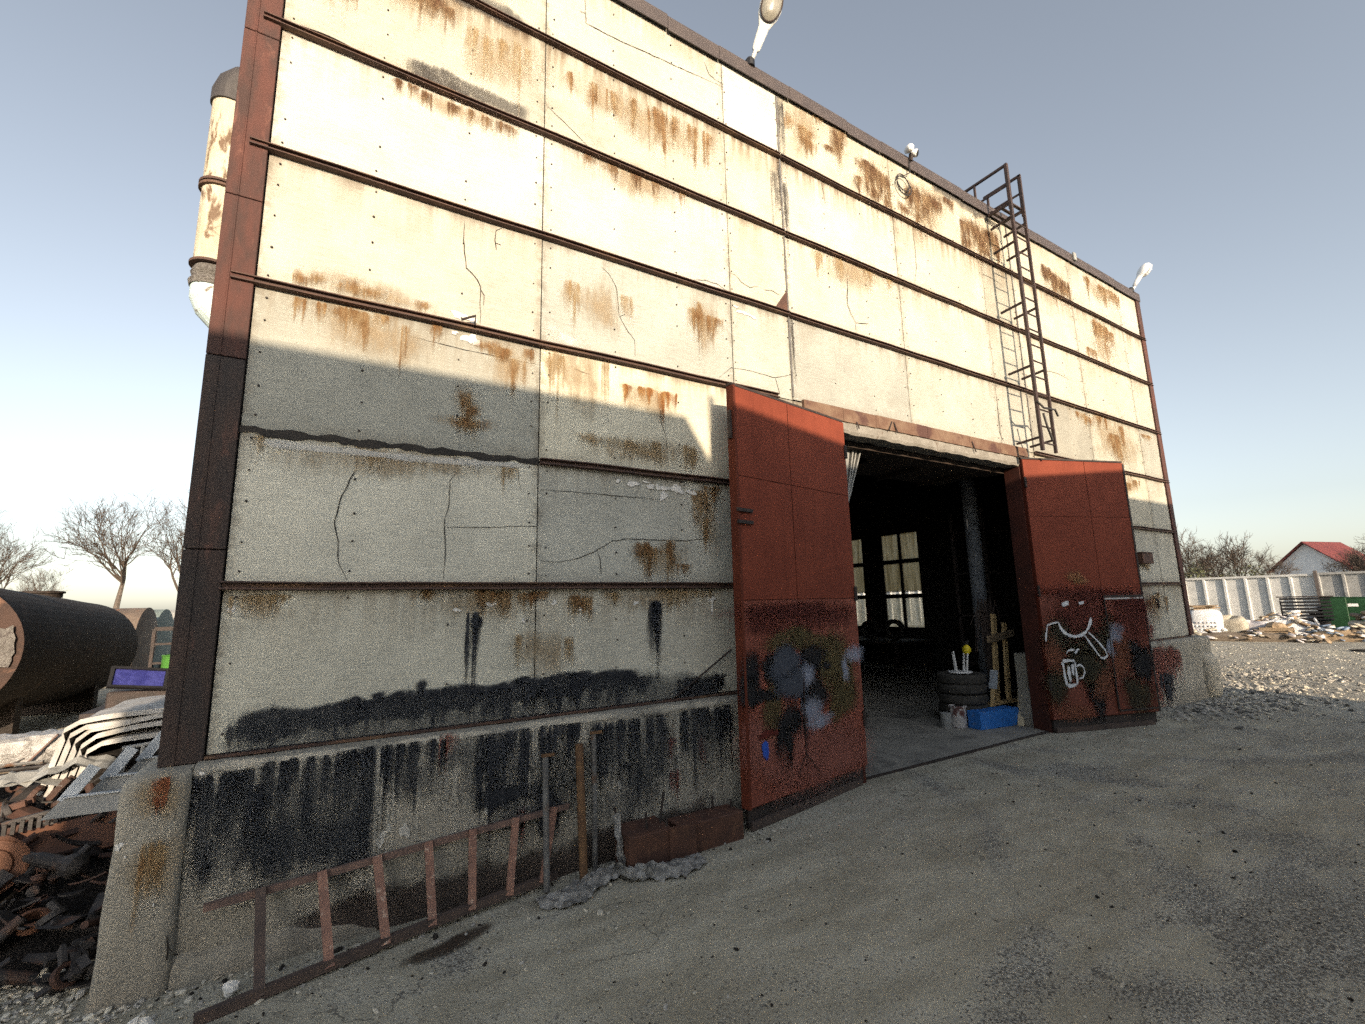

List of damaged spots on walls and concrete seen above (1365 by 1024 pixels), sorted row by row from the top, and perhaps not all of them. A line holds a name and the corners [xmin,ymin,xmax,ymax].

corrosion [589,83,712,161]
corrosion [854,160,1000,260]
corrosion [292,271,428,364]
crack [463,223,502,320]
corrosion [1041,264,1071,300]
crack [334,467,357,578]
crack [443,473,535,577]
crack [541,536,722,573]
leakage [654,602,662,647]
leakage [186,676,653,863]
leakage [604,705,732,785]
leakage [306,819,633,931]